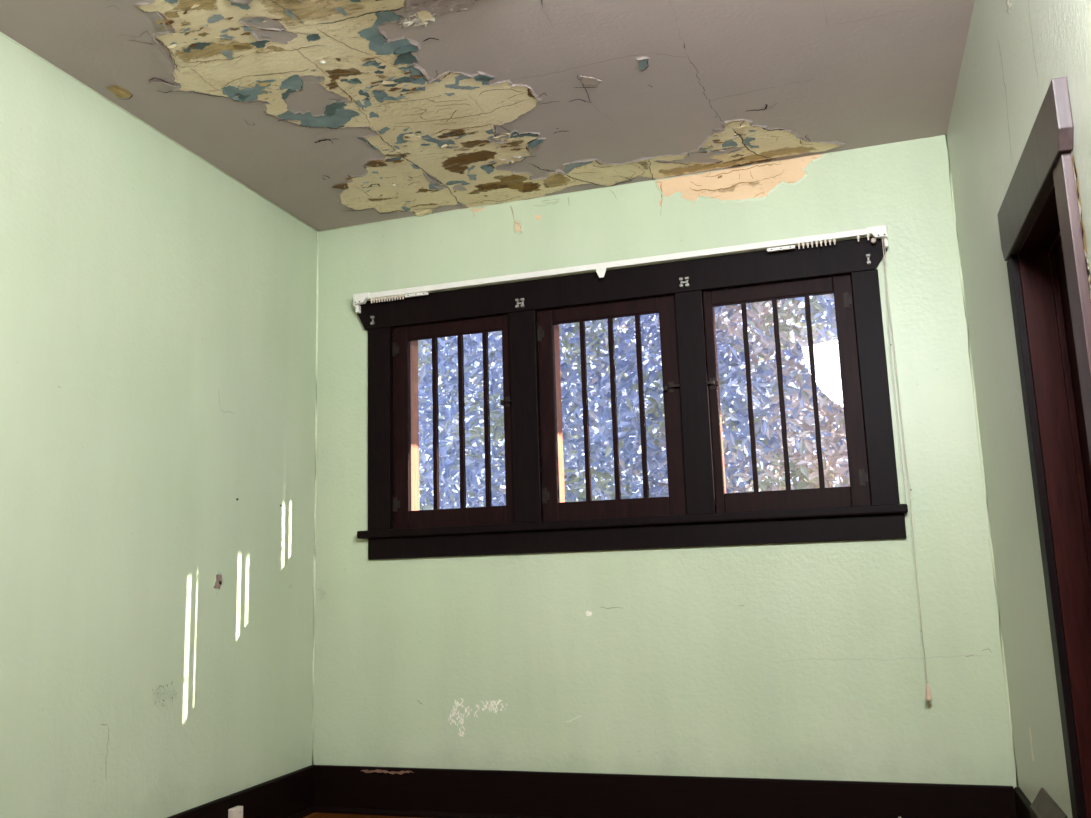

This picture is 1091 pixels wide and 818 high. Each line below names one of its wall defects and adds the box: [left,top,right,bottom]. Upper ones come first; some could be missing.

peeling [133,0,847,236]
crack [514,34,809,159]